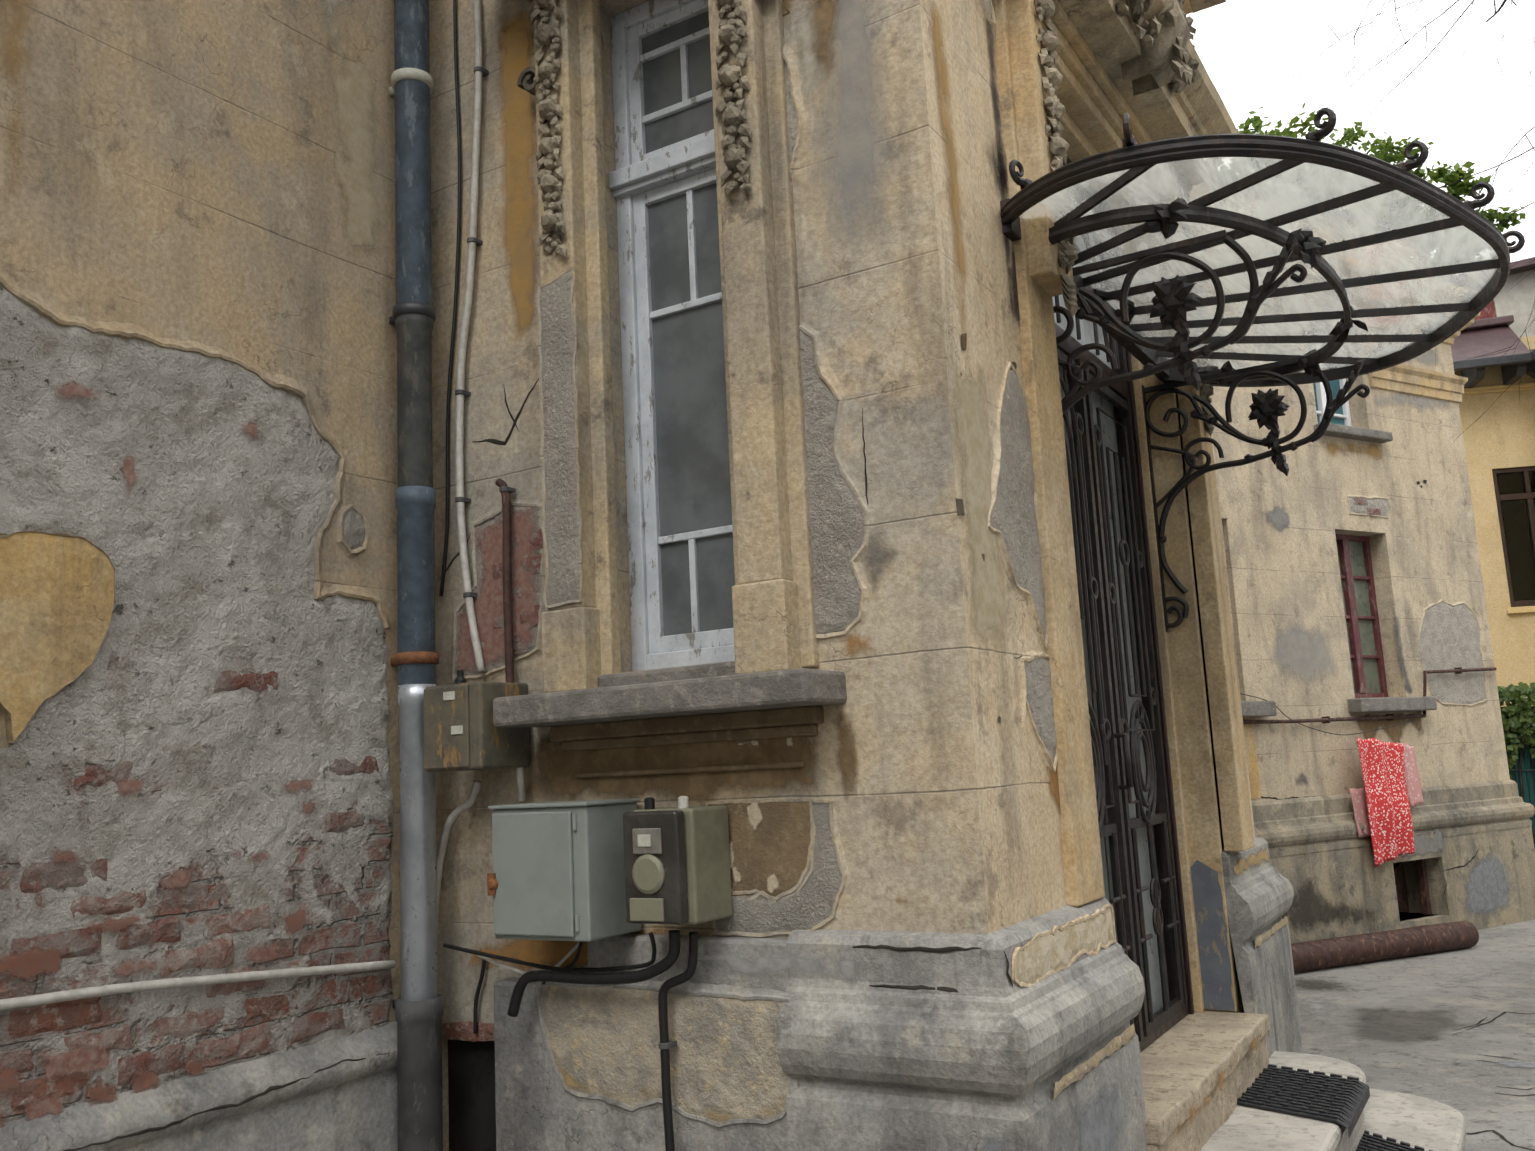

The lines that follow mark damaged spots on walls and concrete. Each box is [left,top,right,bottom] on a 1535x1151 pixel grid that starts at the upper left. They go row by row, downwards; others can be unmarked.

crack [472,378,539,445]
flaking render [799,322,875,644]
flaking render [987,359,1058,773]
flaking render [0,266,394,1128]
flaking render [1417,599,1488,708]
peeling [705,797,851,938]
crack [852,945,1013,992]
peeling [1190,849,1269,1010]
crack [64,1052,390,1151]
peeling [533,980,798,1132]